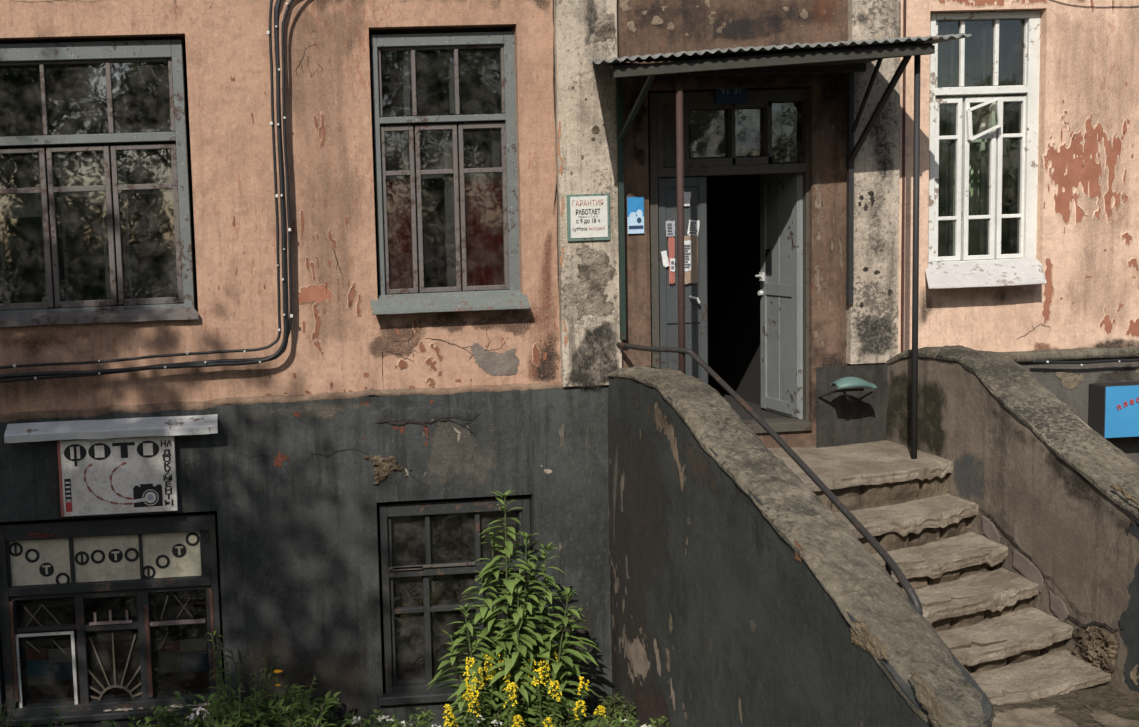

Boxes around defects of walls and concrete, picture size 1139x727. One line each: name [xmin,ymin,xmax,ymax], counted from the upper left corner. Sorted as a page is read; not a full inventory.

peeling [932,0,1048,8]
peeling [1042,100,1133,234]
peeling [291,209,362,356]
peeling [381,318,444,404]
spalling [471,337,559,377]
spalling [559,245,617,347]
peeling [1098,303,1139,338]
peeling [1120,231,1139,279]
peeling [654,402,686,493]
water stain [886,374,944,454]
spalling [1071,625,1119,674]
peeling [1130,664,1139,686]